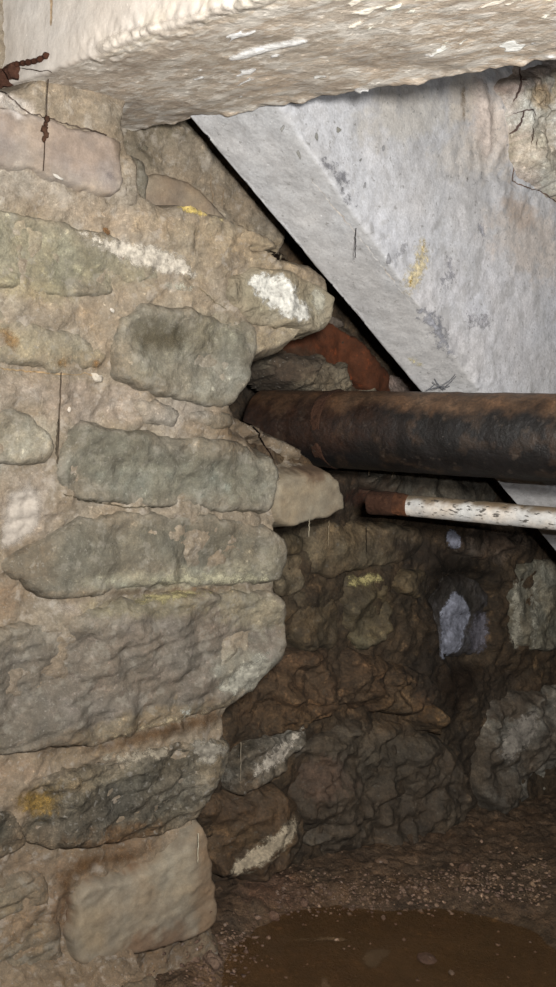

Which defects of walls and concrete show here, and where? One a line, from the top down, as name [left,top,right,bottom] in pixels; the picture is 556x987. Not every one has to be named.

rust [0,52,50,89]
crack [0,91,106,136]
crack [509,67,538,145]
crack [512,167,556,202]